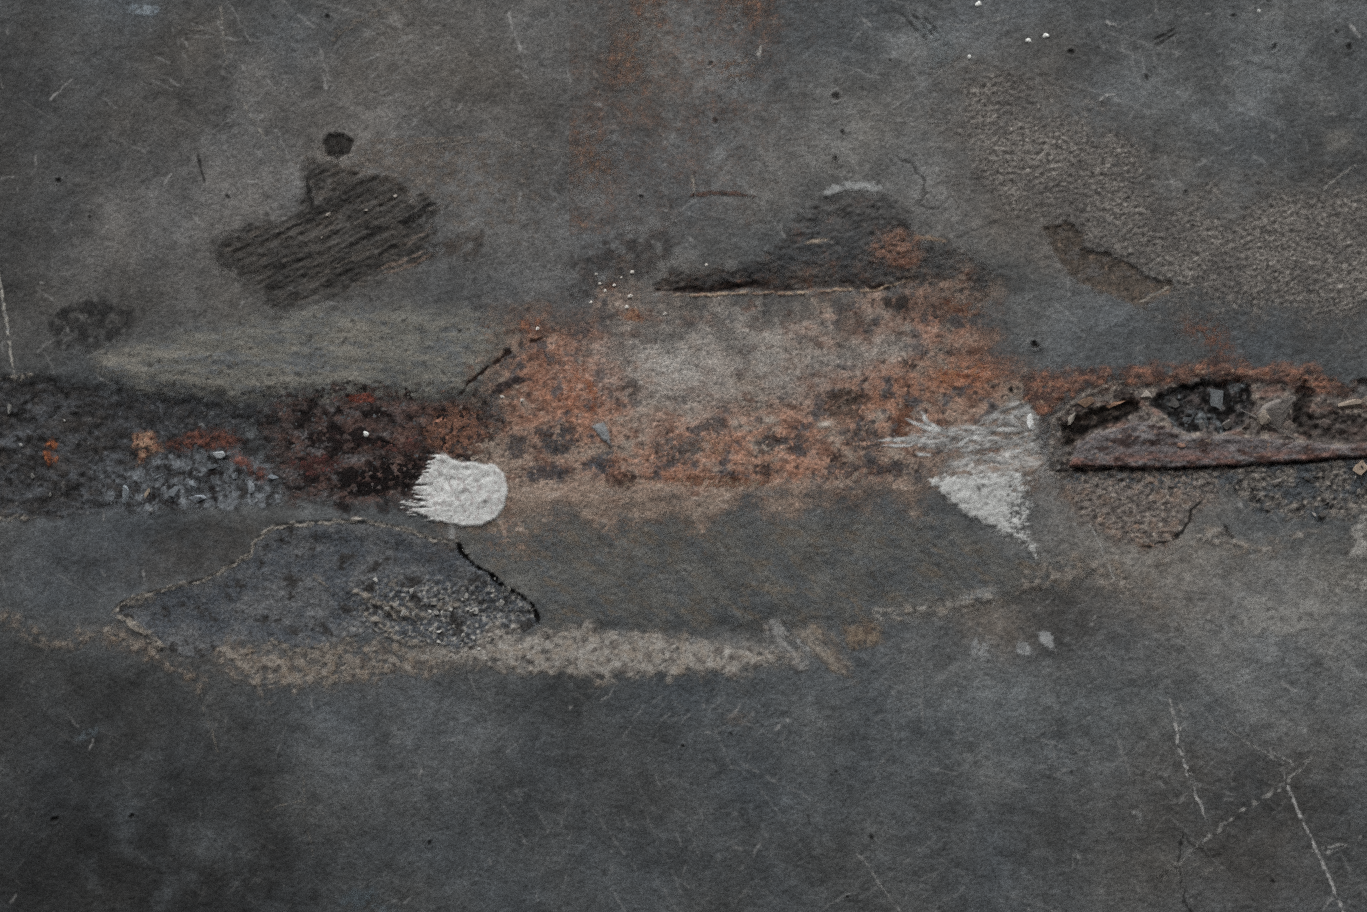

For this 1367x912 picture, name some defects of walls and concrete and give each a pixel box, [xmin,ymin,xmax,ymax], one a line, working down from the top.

spalling [656,264,929,310]
spalling [0,373,288,523]
corrosion [133,267,1367,561]
spalling [0,517,995,696]